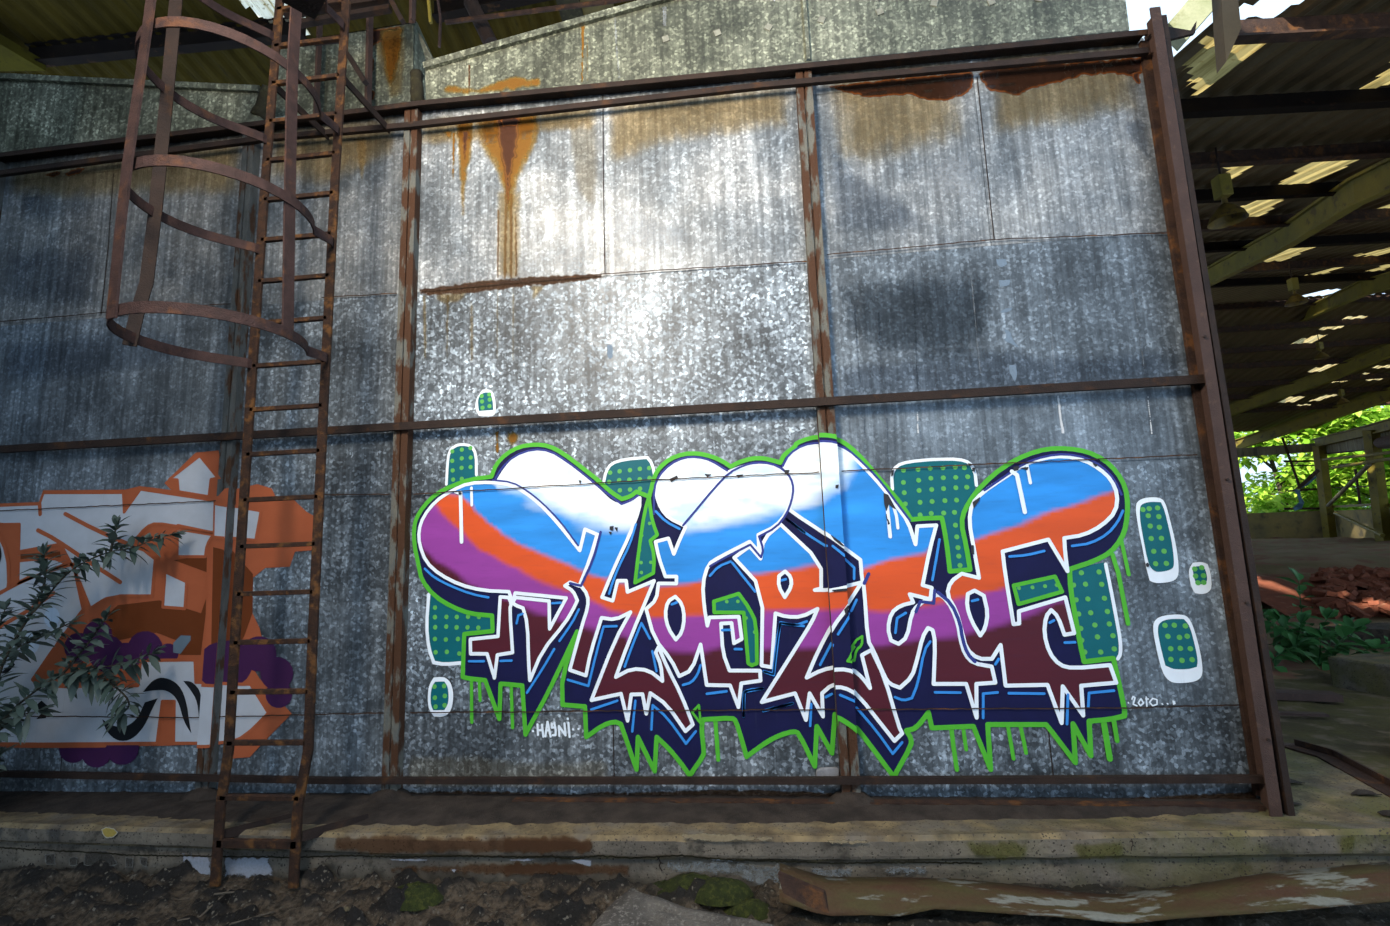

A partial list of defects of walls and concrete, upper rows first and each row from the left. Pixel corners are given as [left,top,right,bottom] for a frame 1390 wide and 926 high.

rust [830,57,1142,101]
rust [420,116,601,296]
rust [410,789,834,797]